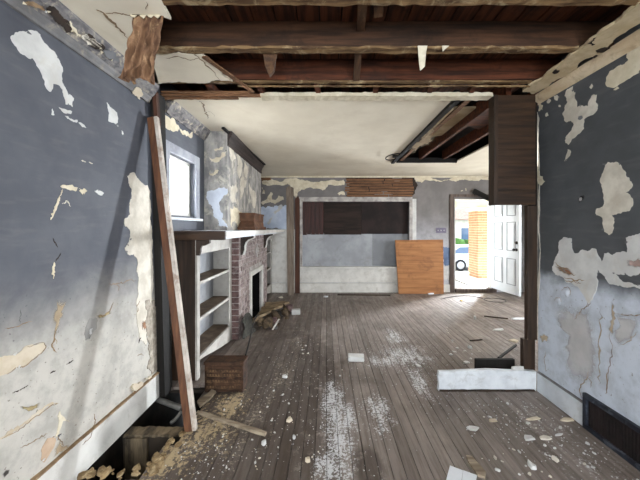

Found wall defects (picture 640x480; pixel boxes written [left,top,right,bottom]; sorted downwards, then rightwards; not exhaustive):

crack [96,9,130,37]
peeling [10,30,86,128]
peeling [605,46,640,90]
peeling [537,84,598,161]
peeling [50,185,87,220]
flaking render [206,147,488,229]
peeling [537,165,545,246]
peeling [595,162,633,235]
peeling [124,172,157,393]
peeling [552,233,640,304]
peeling [0,342,46,376]